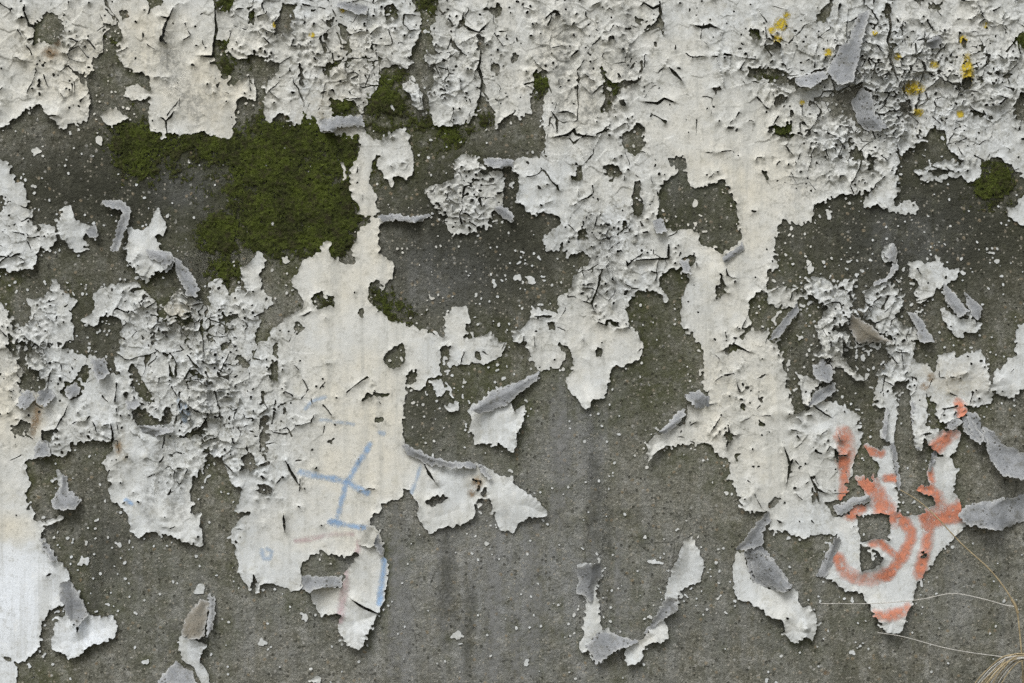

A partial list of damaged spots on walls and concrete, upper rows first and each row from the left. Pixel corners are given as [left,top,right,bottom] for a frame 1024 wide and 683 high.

crack [203,11,218,58]
crack [551,111,593,138]
peeling [592,55,667,156]
crack [643,3,664,34]
crack [645,68,682,105]
peeling [744,4,911,185]
crack [886,14,896,77]
peeling [0,0,330,419]
peeling [652,155,744,263]
peeling [125,353,174,437]
peeling [383,343,406,369]
peeling [724,125,1024,571]